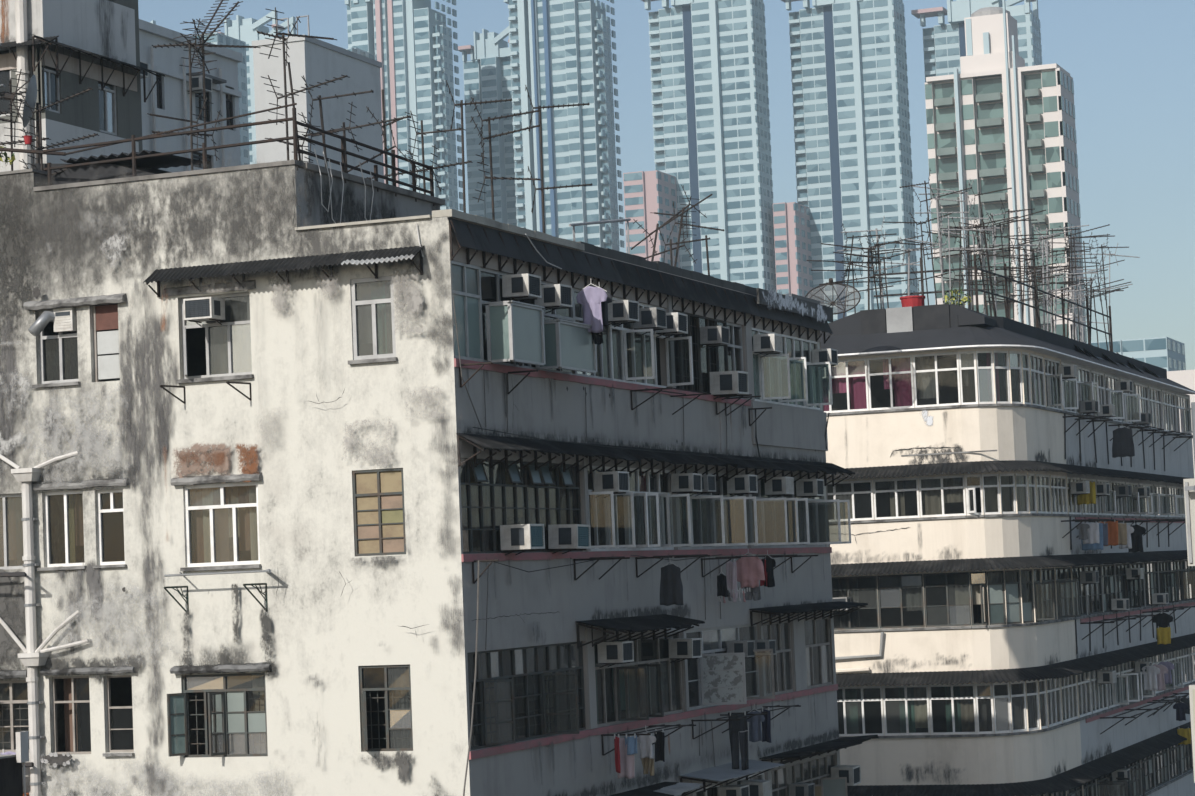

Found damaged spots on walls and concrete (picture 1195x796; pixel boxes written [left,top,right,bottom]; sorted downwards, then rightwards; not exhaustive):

leakage [168,166,414,278]
leakage [0,182,177,535]
leakage [0,569,26,664]
leakage [144,550,165,627]
leakage [443,610,462,647]
leakage [133,659,164,796]
leakage [374,751,409,782]